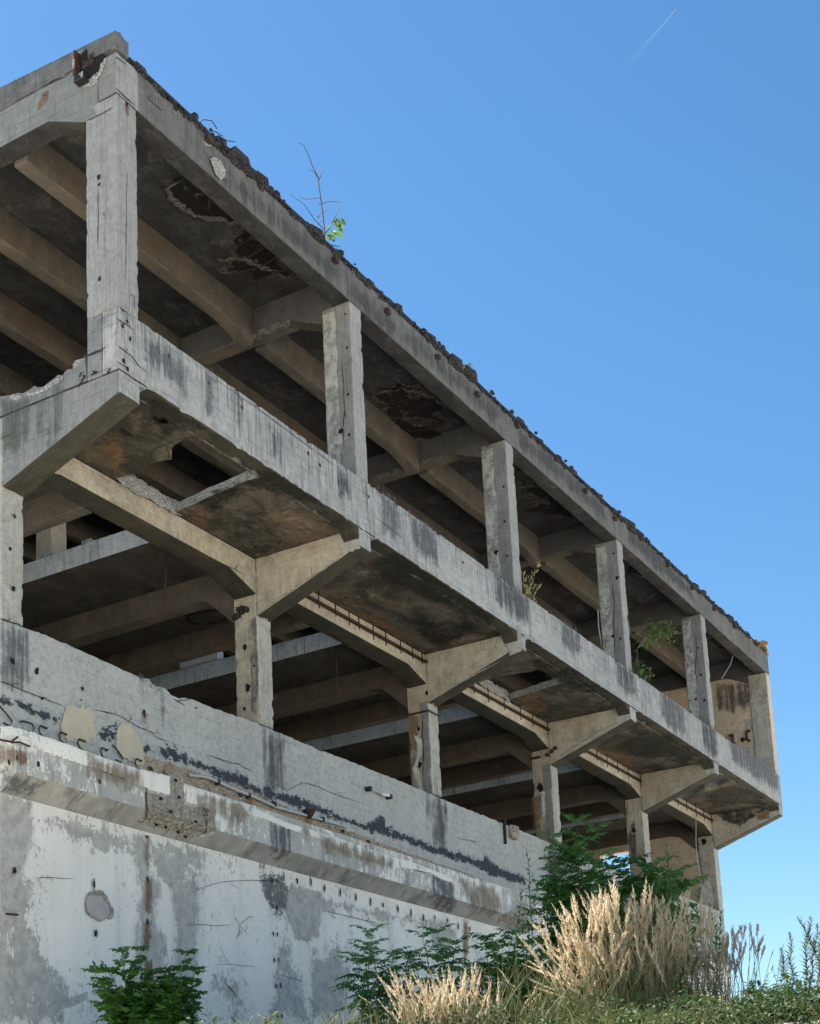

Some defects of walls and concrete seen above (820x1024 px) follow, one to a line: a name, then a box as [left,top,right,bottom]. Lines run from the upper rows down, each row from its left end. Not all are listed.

spalling [204,141,226,180]
spalling [8,376,63,402]
spalling [118,475,181,516]
leakage [192,472,316,529]
crack [0,681,63,706]
crack [95,710,167,741]
leakage [264,736,284,789]
leakage [705,683,778,825]
peeling [0,708,494,1024]
leakage [268,821,291,860]
rust [143,843,153,979]
crack [183,916,255,999]